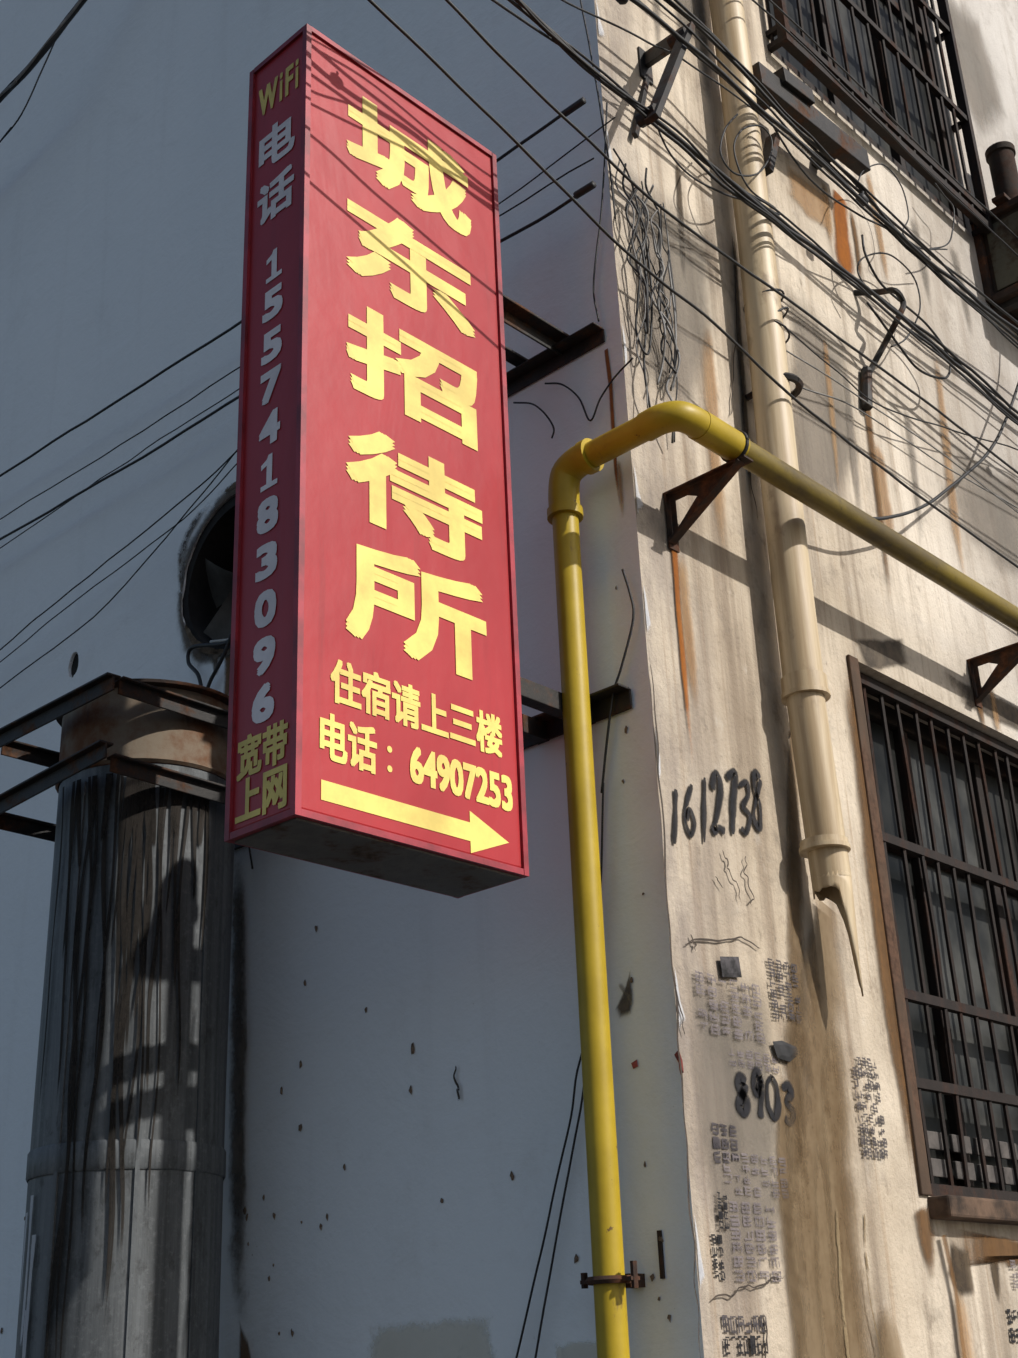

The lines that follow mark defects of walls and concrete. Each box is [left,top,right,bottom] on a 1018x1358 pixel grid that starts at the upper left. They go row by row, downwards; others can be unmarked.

rust [791,171,861,274]
rust [672,550,695,721]
damp [698,733,904,1358]